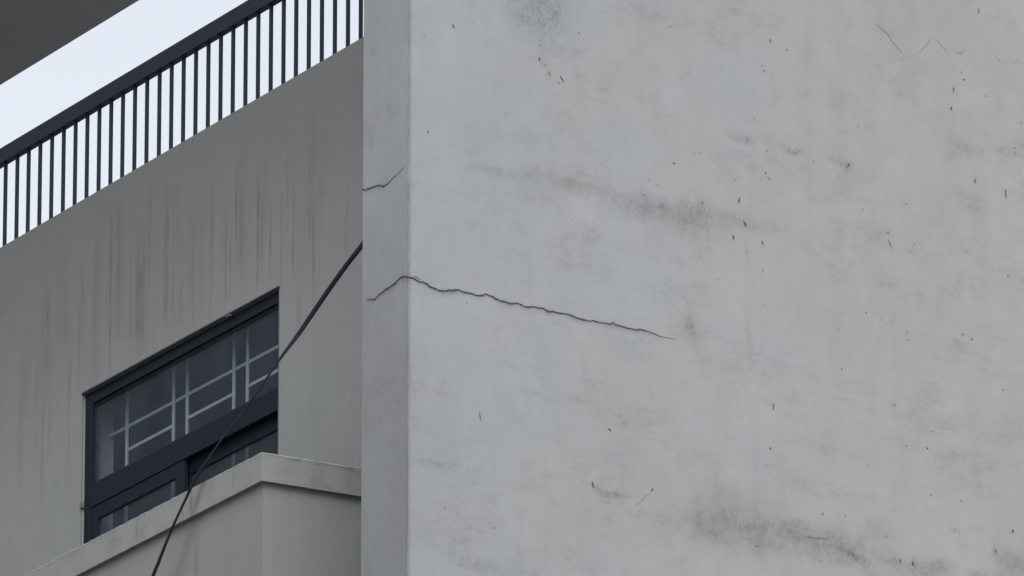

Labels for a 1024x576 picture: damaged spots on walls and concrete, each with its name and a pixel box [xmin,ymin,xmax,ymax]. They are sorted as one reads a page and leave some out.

crack [367,275,667,338]